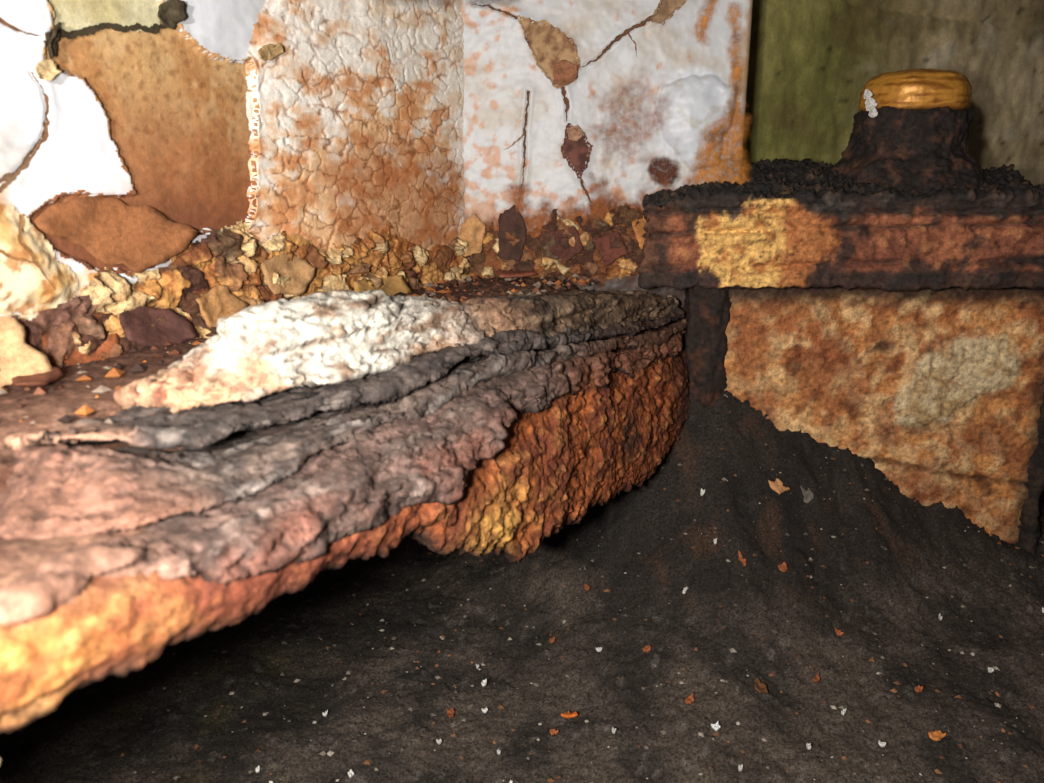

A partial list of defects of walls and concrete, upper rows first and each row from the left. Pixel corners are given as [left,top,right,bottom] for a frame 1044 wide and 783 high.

crack [0,17,42,36]
peeling [516,14,580,89]
rust [696,0,716,41]
crack [0,72,49,193]
peeling [27,0,284,275]
spalling [561,123,593,178]
rust [693,7,748,185]
peeling [41,285,249,367]
rust [0,158,689,625]
rust [768,478,814,503]